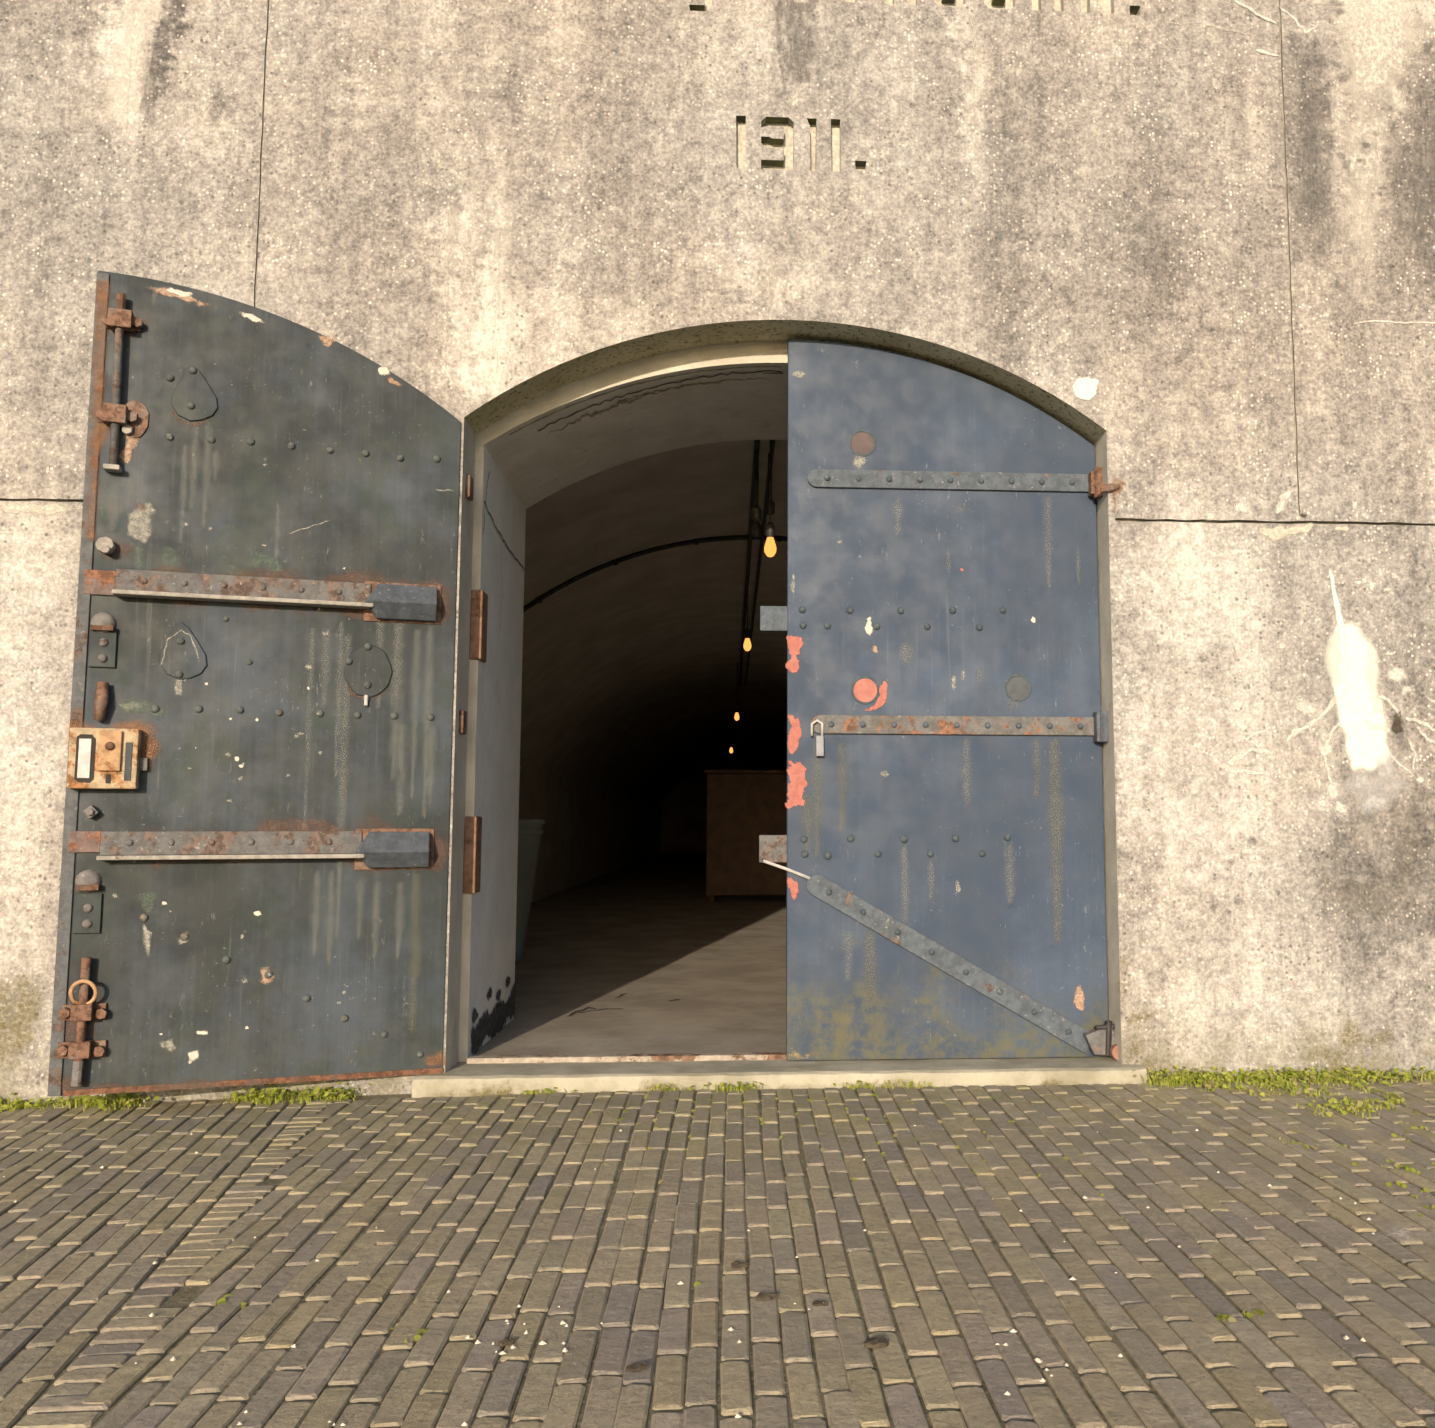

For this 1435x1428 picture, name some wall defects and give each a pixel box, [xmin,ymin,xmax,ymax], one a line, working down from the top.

leakage [1306,0,1435,246]
leakage [1225,726,1273,775]
leakage [1286,568,1411,813]